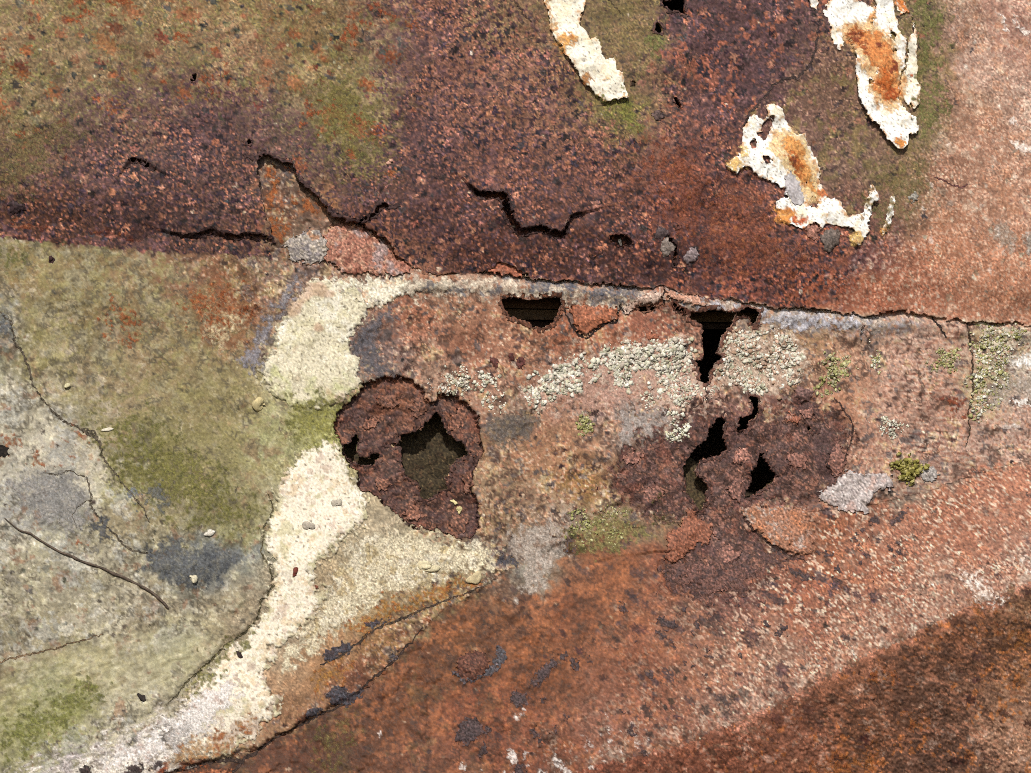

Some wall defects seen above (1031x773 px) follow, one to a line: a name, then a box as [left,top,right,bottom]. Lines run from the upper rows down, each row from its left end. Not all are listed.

peeling [544,0,635,102]
peeling [809,0,921,149]
rust [837,11,913,113]
crack [170,226,276,245]
rust [263,164,410,278]
rust [640,128,829,281]
peeling [726,103,895,245]
crack [561,302,624,339]
spalling [696,323,732,383]
rust [741,500,821,560]
crack [168,494,275,703]
crack [165,587,480,773]